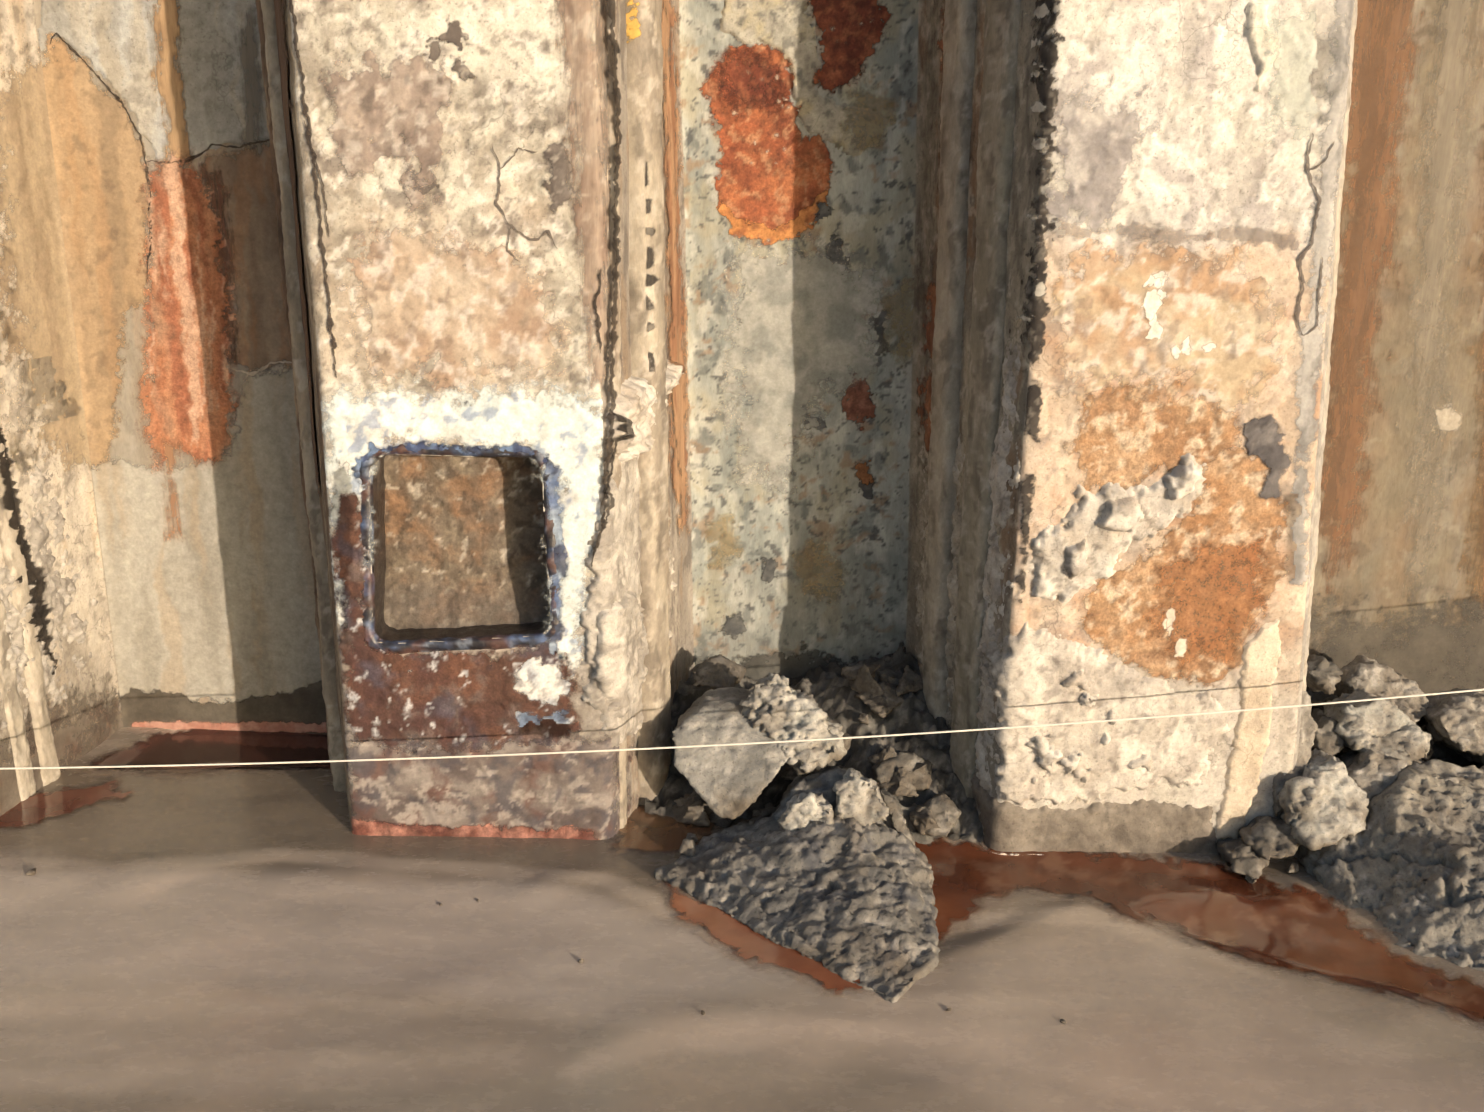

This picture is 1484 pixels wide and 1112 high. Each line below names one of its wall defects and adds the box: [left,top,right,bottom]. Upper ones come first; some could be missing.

rust [138,152,238,538]
crack [289,0,337,377]
crack [492,146,557,262]
crack [591,0,622,567]
rust [700,0,892,245]
crack [1295,133,1334,336]
rust [1319,0,1484,608]
leakage [332,440,568,654]
rust [330,492,582,755]
peeling [1063,496,1145,580]
rust [1063,379,1289,686]
peeling [1162,460,1202,501]